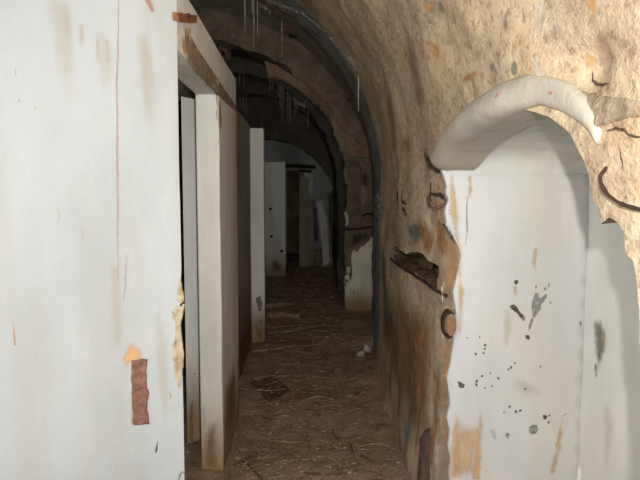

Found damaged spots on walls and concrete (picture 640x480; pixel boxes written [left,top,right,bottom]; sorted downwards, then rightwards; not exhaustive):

spalling [581,91,640,127]
peeling [344,237,373,310]
spalling [390,249,448,298]
rust [125,346,140,363]
spalling [172,278,185,388]
peeling [509,282,551,340]